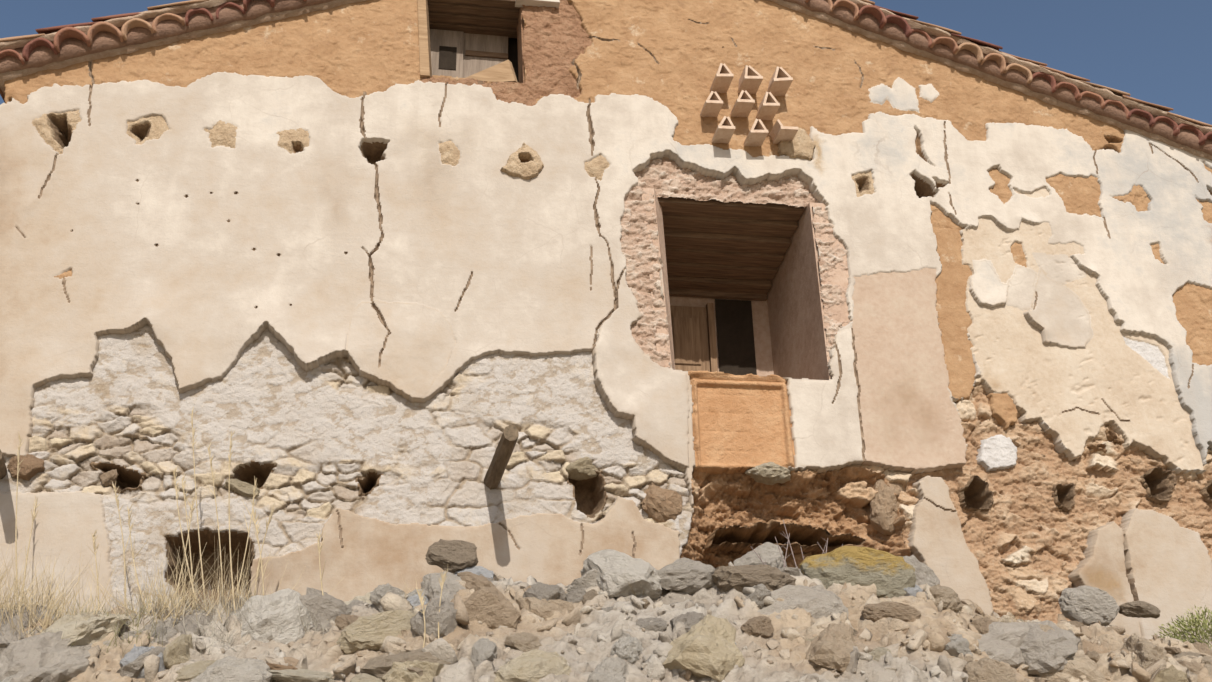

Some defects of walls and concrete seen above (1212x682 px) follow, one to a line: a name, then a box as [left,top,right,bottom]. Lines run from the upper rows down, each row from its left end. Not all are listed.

spalling [359,142,387,165]
spalling [915,134,927,162]
crack [571,36,660,351]
crack [359,91,391,368]
crack [1102,217,1111,239]
crack [454,271,473,312]
flaking render [0,157,1212,613]
crack [832,328,866,465]
crack [499,522,520,550]
crack [577,524,585,556]
crack [630,532,638,558]